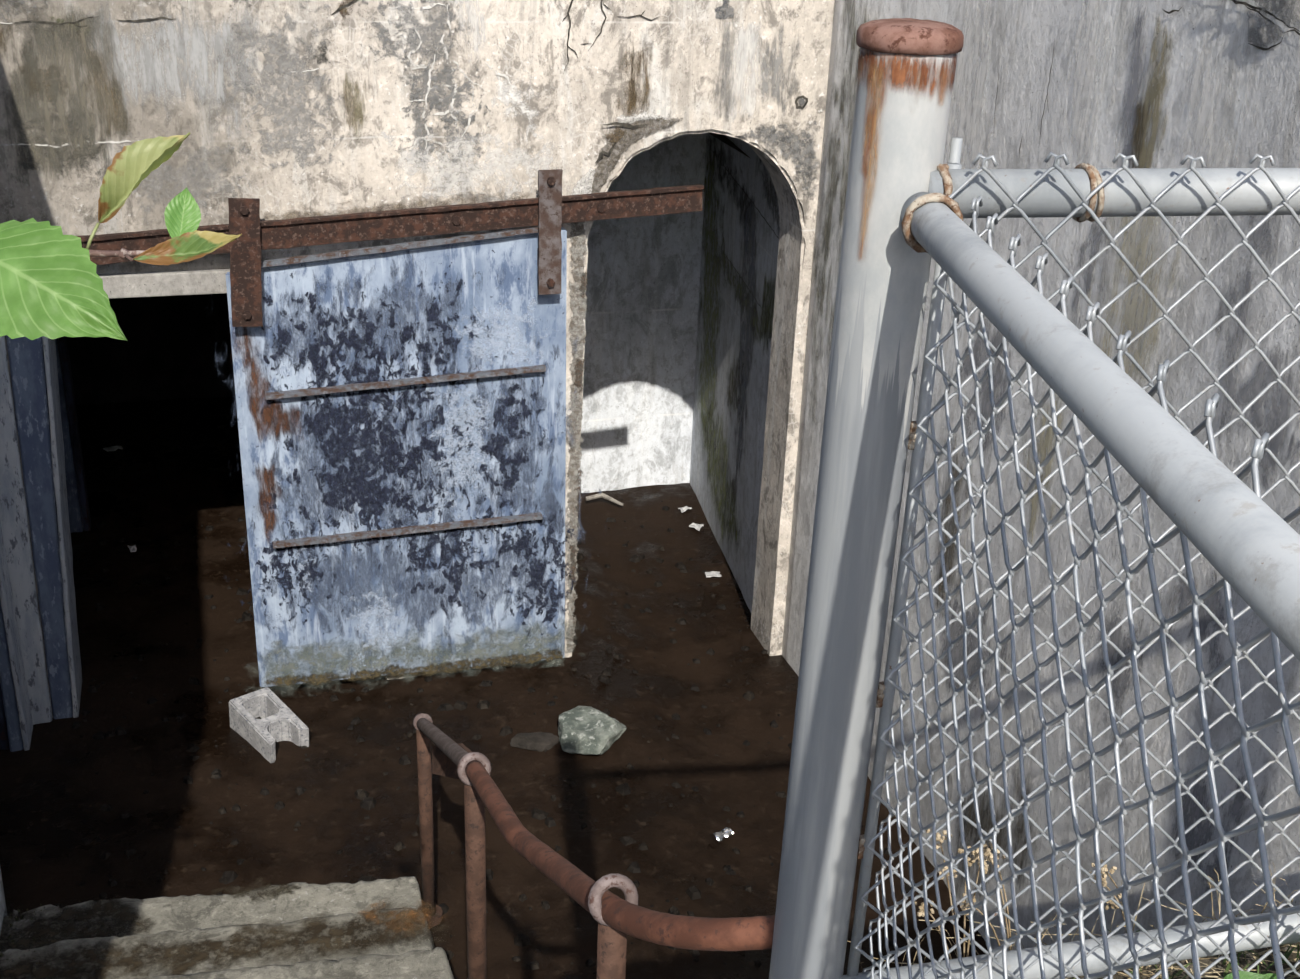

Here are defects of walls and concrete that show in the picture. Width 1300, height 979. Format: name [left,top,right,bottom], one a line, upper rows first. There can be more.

leakage [0,0,363,173]
crack [562,0,663,74]
rust [857,49,958,256]
leakage [1122,11,1170,168]
crack [1232,0,1300,50]
leakage [710,24,820,503]